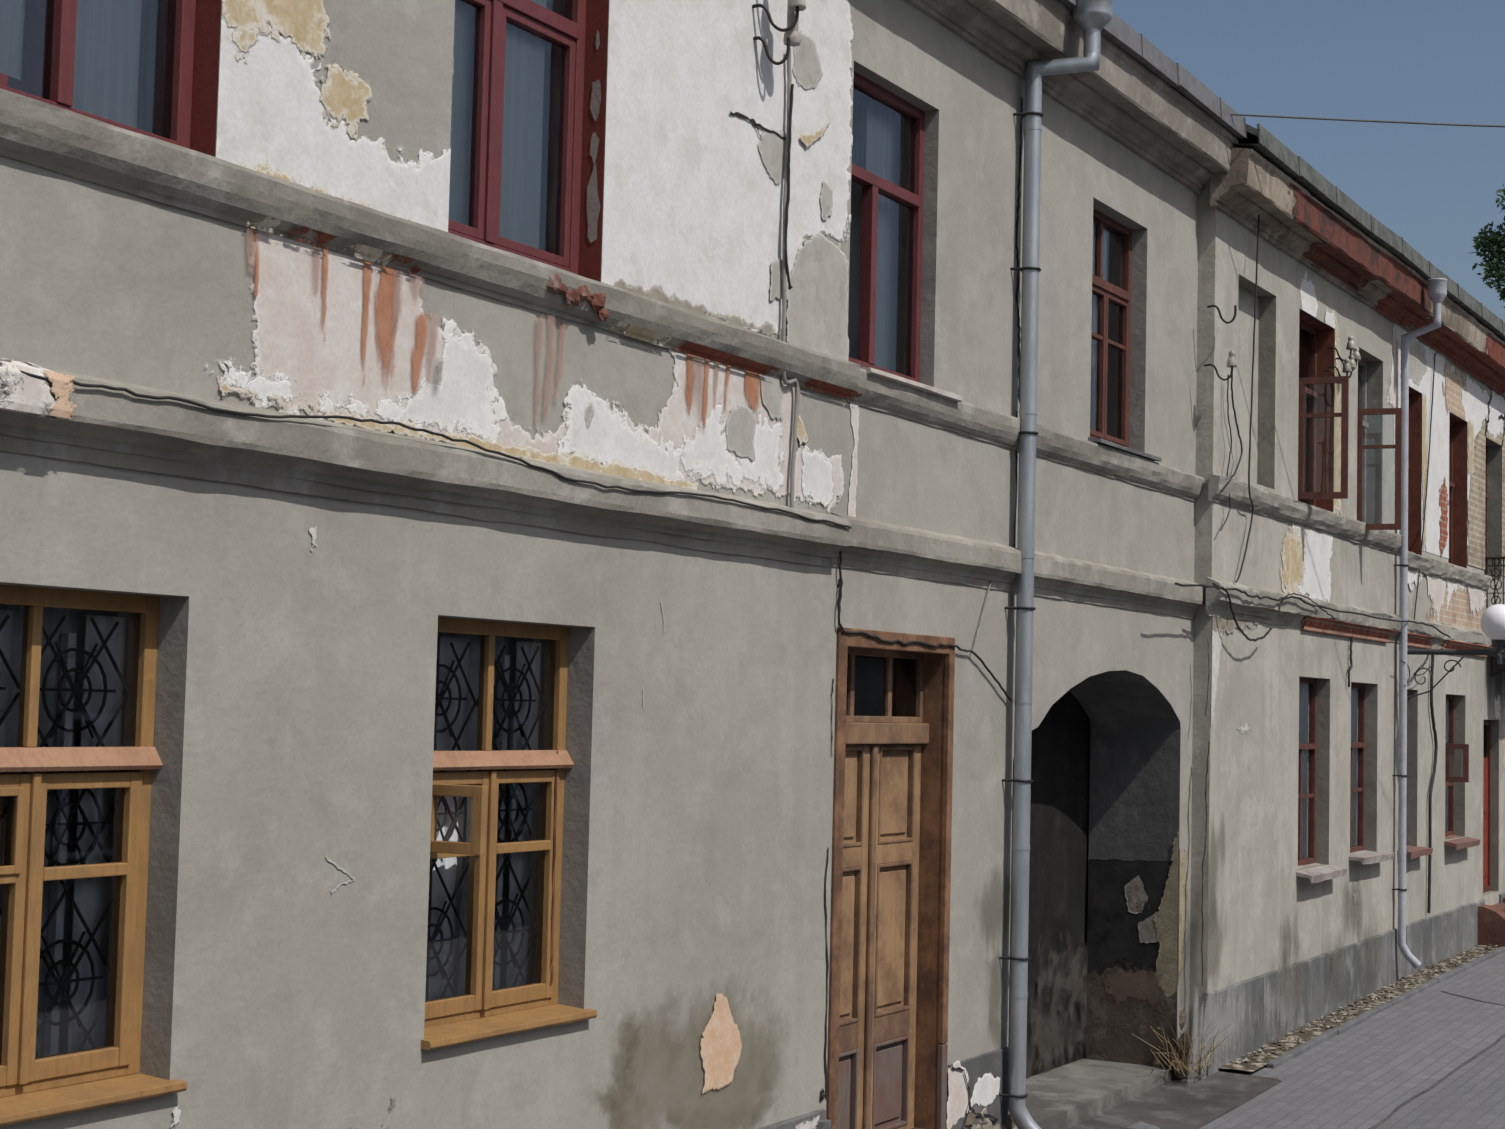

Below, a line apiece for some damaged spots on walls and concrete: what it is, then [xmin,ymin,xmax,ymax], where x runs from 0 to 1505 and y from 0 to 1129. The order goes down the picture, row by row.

peeling [0,357,80,422]
rust [248,225,259,296]
rust [315,243,328,326]
rust [362,261,420,378]
rust [412,313,438,392]
peeling [206,0,862,517]
peeling [1289,183,1505,576]
peeling [1280,523,1492,657]
peeling [700,993,742,1094]
damp [1026,946,1088,1076]
flaking render [795,1115,831,1129]
peeling [946,1060,1018,1129]